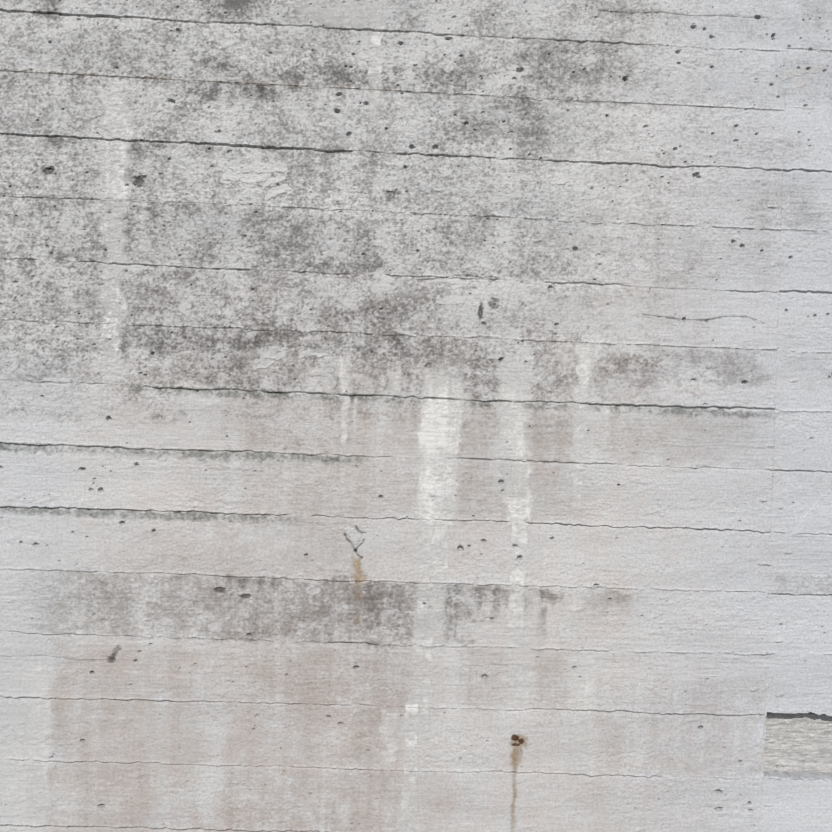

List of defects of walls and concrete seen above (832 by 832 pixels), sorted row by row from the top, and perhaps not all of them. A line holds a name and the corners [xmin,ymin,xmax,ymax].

leakage [370,23,384,46]
leakage [326,359,361,446]
corrosion [511,735,526,762]